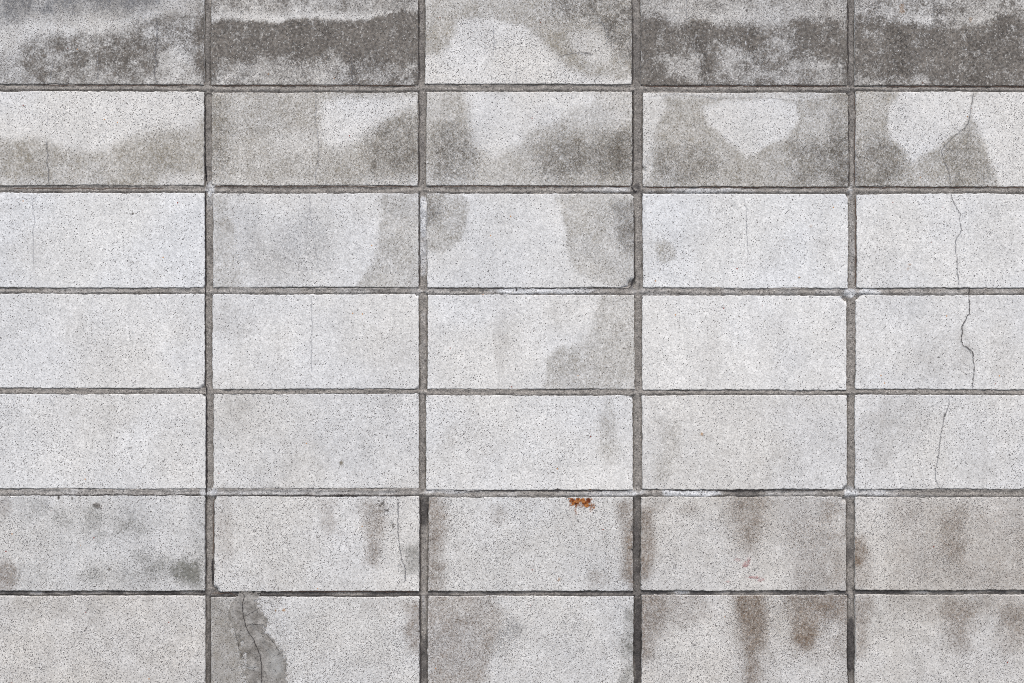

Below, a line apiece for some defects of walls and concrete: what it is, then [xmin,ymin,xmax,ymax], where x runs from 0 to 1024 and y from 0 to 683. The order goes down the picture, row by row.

damp [21,0,452,97]
damp [548,0,1024,122]
damp [97,117,229,185]
damp [535,130,632,185]
damp [655,100,987,187]
crack [432,86,1024,388]
crack [14,4,635,683]
corrosion [568,498,595,508]
damp [794,596,847,648]